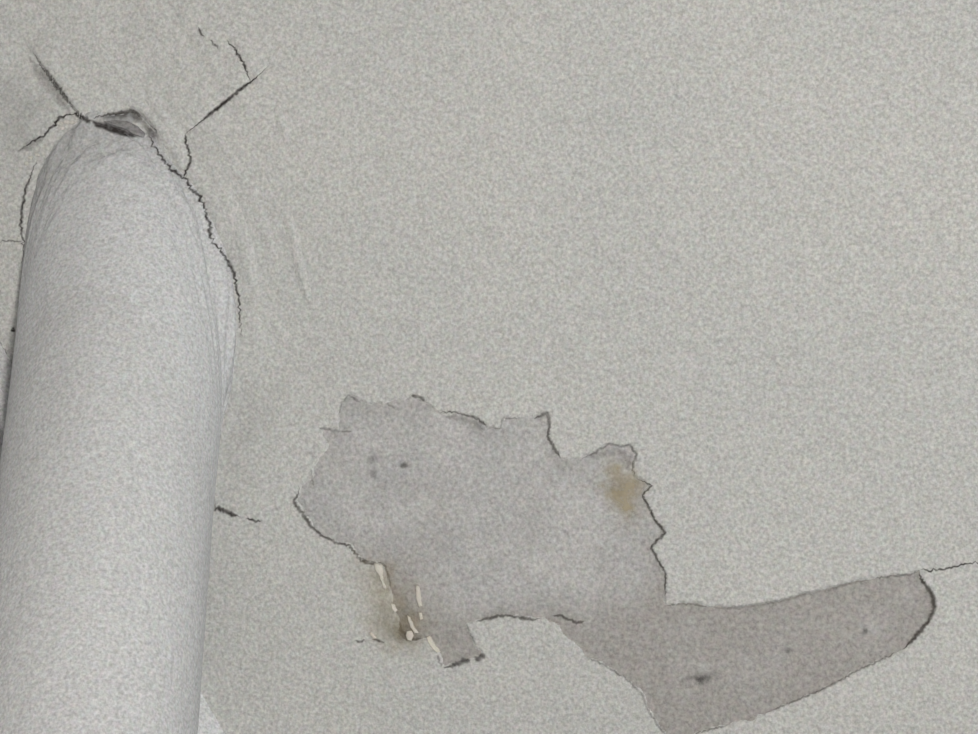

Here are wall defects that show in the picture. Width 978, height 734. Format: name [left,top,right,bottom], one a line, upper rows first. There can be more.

crack [19,64,90,260]
crack [151,42,268,331]
peeling [294,395,936,734]